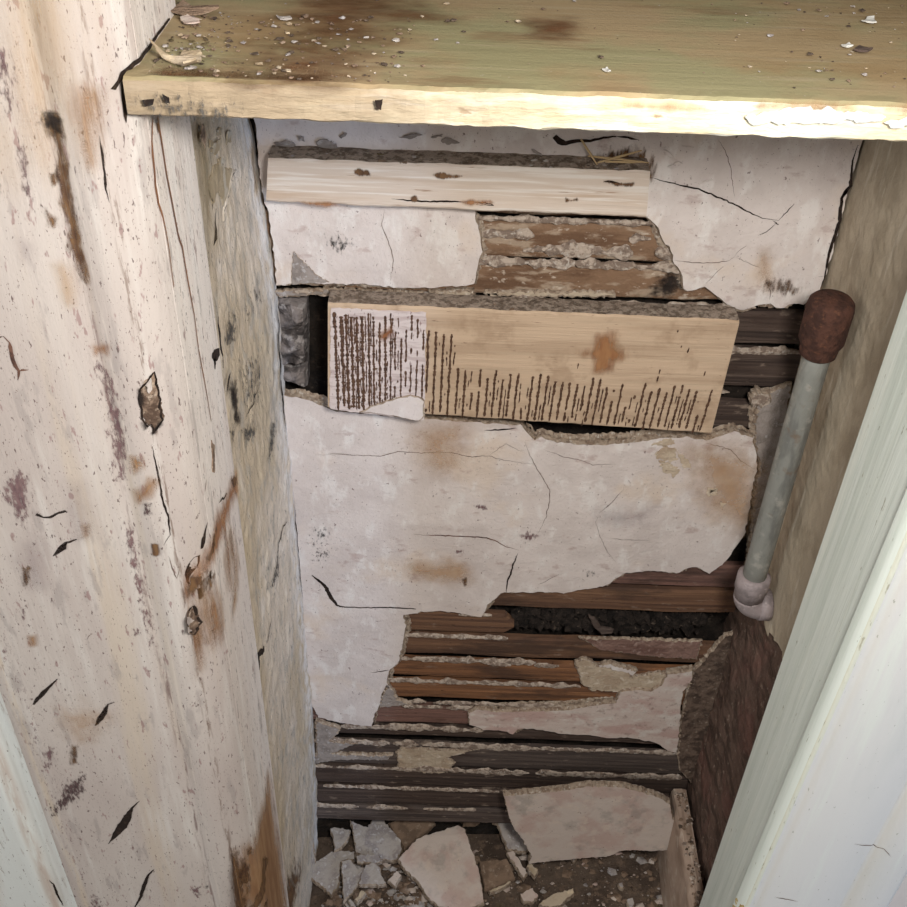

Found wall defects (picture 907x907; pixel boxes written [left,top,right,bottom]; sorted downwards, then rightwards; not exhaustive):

damp [160,69,250,77]
damp [267,0,428,82]
spalling [275,200,693,302]
crack [651,142,792,276]
crack [820,146,858,288]
peeling [138,371,165,434]
spalling [525,381,793,565]
rust [186,473,238,604]
crack [274,501,414,609]
crack [416,534,518,592]
spalling [314,611,733,783]
damp [232,779,301,907]